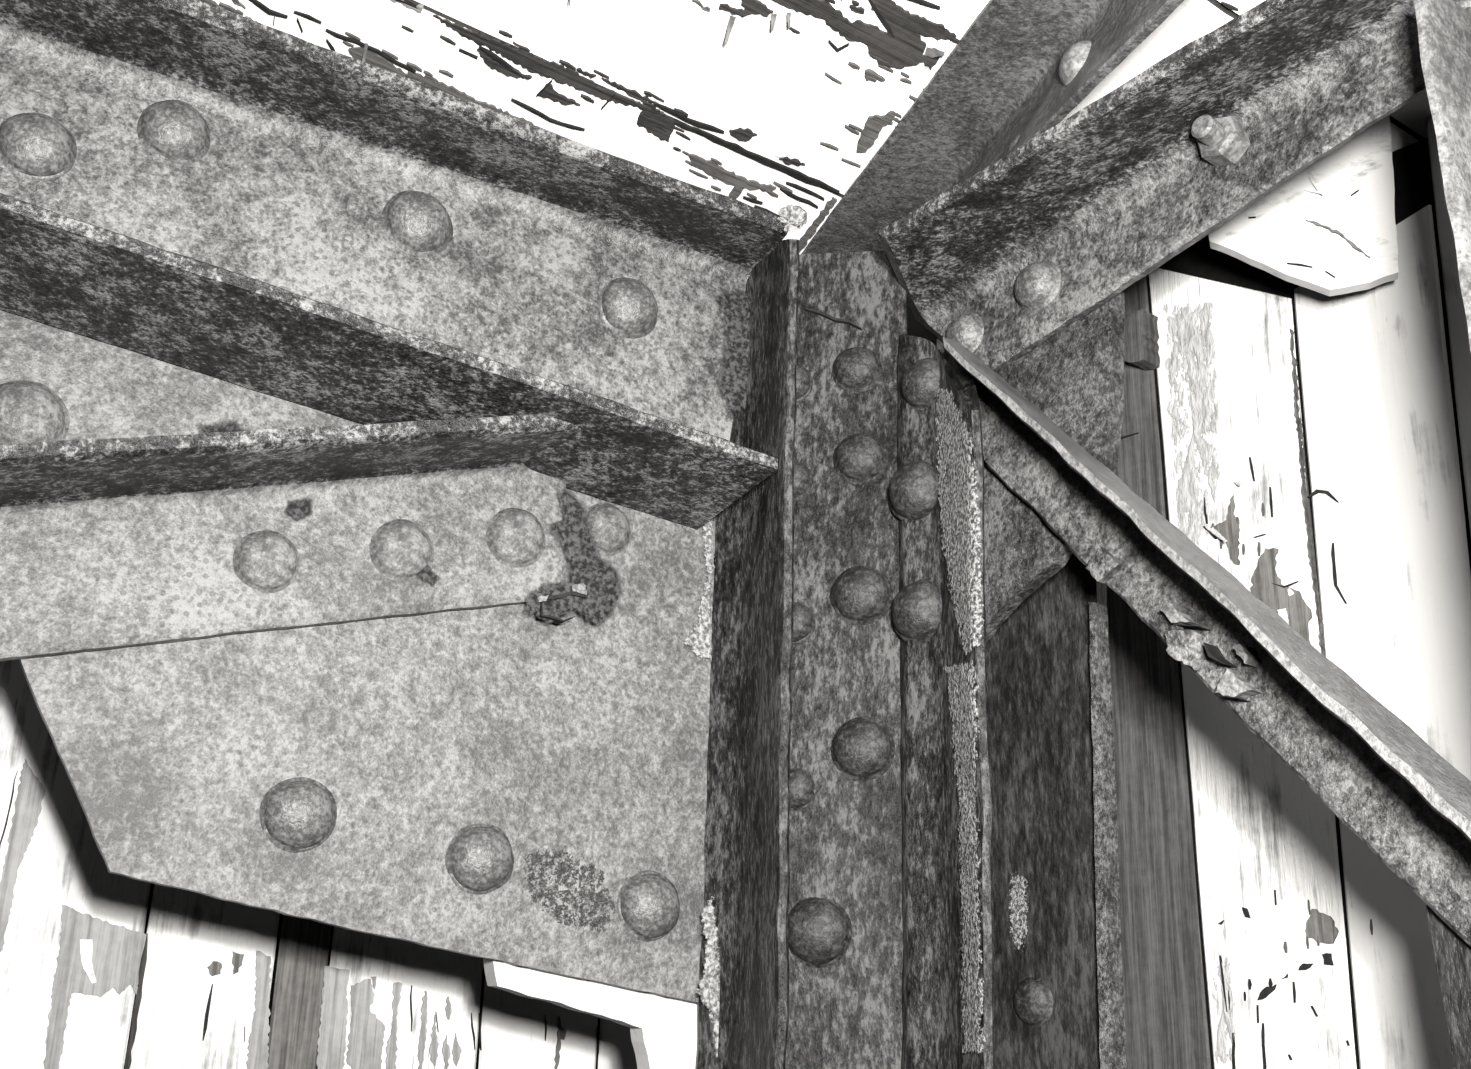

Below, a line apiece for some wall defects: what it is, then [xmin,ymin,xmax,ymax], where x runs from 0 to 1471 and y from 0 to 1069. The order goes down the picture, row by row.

peeling [692,0,960,101]
peeling [199,0,840,252]
peeling [820,111,902,168]
peeling [1164,302,1312,644]
corrosion [525,489,621,625]
corrosion [1086,546,1125,583]
corrosion [1161,602,1262,702]
corrosion [522,848,617,934]
peeling [43,905,148,1069]
peeling [202,951,272,1069]
peeling [316,966,482,1069]
peeling [1210,900,1339,1069]